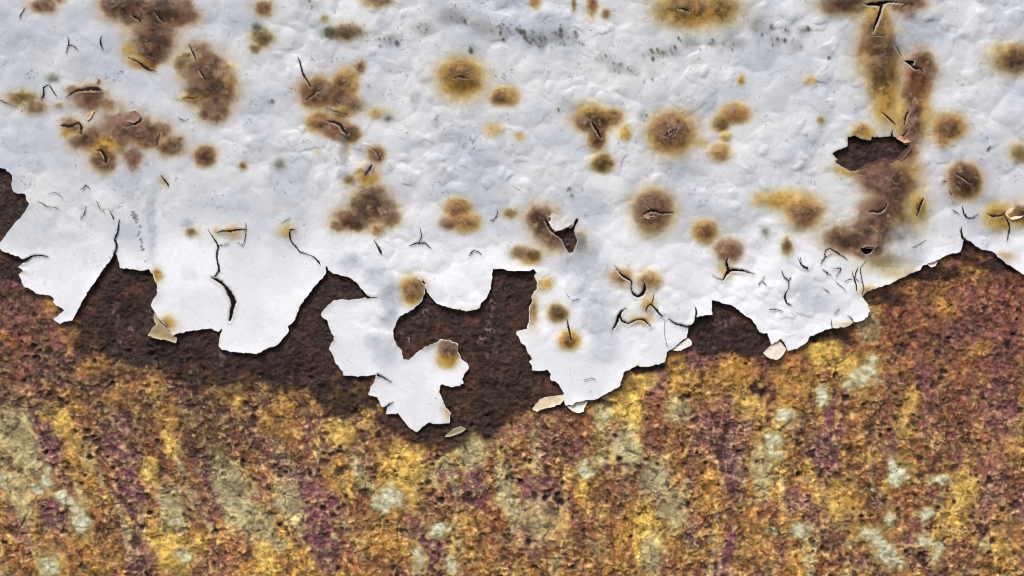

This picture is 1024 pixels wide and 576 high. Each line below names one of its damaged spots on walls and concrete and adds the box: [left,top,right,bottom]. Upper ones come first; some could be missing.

corrosion [100,0,238,124]
crack [866,1,922,71]
corrosion [8,75,216,174]
corrosion [753,0,967,277]
peeling [0,168,29,282]
peeling [78,257,371,417]
crack [208,225,246,321]
corrosion [329,145,402,235]
peeling [376,269,613,451]
crack [613,269,697,346]
peeling [673,300,786,360]
crack [723,248,866,328]